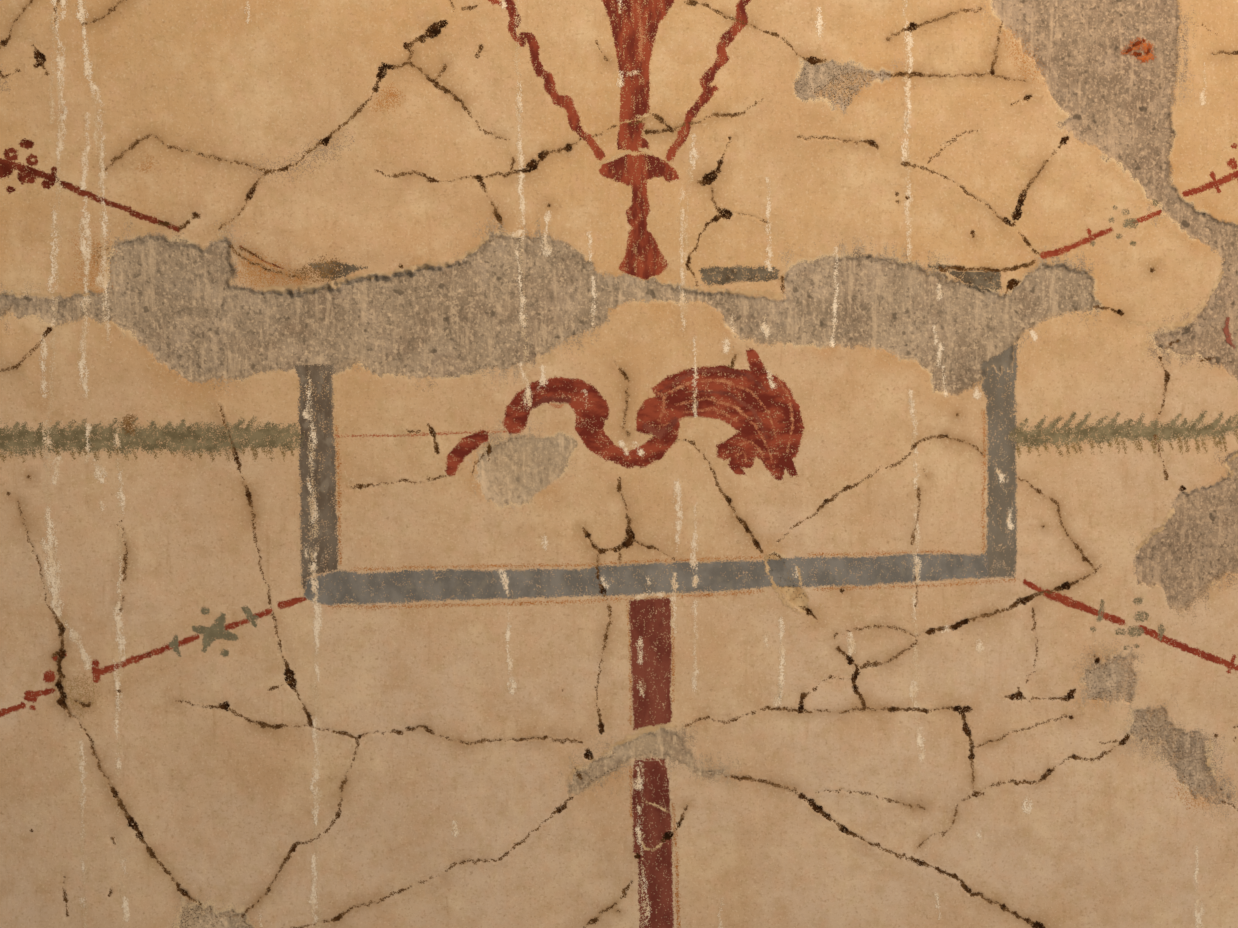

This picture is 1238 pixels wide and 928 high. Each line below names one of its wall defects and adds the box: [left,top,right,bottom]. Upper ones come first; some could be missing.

crack [106,0,768,286]
flaking render [0,213,1104,397]
crack [797,130,1070,297]
flaking render [976,0,1238,387]
water stain [39,0,136,928]
crack [7,476,202,905]
crack [178,404,687,928]
flaking render [464,417,578,524]
flaking render [559,720,743,797]
crack [675,413,982,558]
crack [685,478,1130,928]
flaking render [1129,447,1238,626]